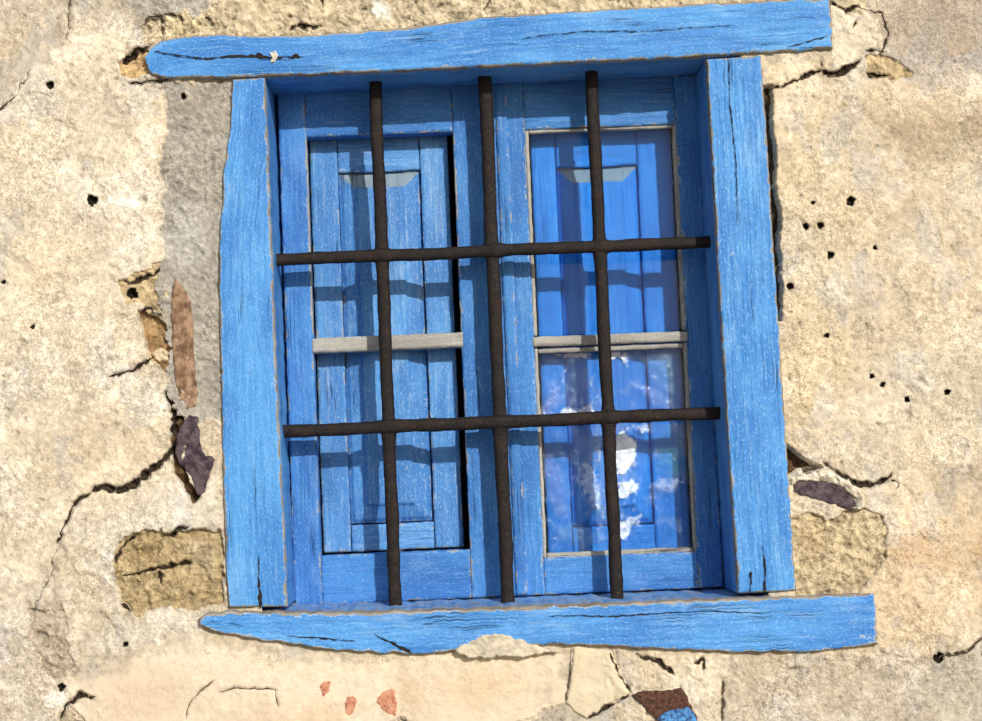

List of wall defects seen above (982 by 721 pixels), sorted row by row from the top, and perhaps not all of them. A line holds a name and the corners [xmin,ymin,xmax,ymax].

crack [773,1,889,88]
crack [33,410,178,623]
crack [115,536,191,584]
spalling [113,529,225,617]
crack [169,526,189,536]
spalling [788,462,888,595]
peeling [27,604,630,721]
crack [938,638,982,659]